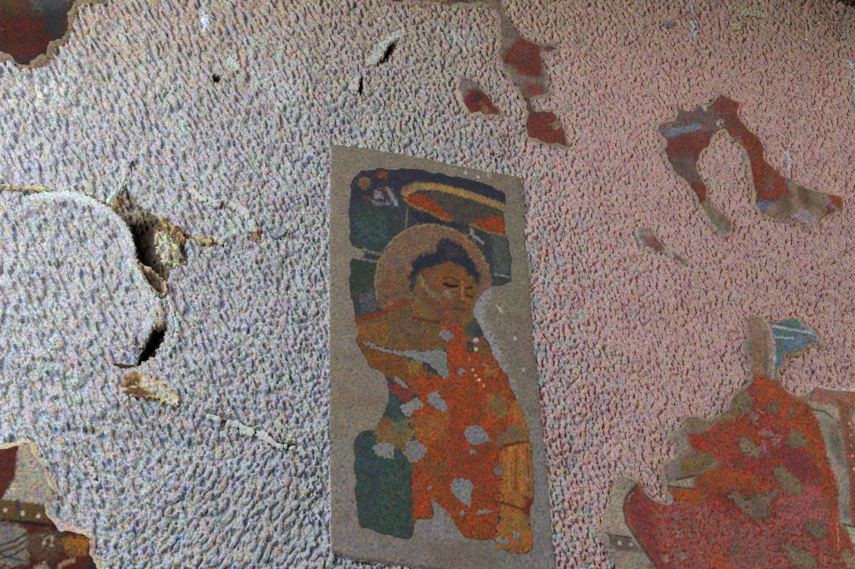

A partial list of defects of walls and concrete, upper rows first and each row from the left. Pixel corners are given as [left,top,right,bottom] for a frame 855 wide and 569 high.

peeling [363,330,466,378]
peeling [400,391,447,417]
peeling [372,440,427,463]
peeling [464,425,492,455]
peeling [450,478,492,516]
peeling [496,530,521,545]